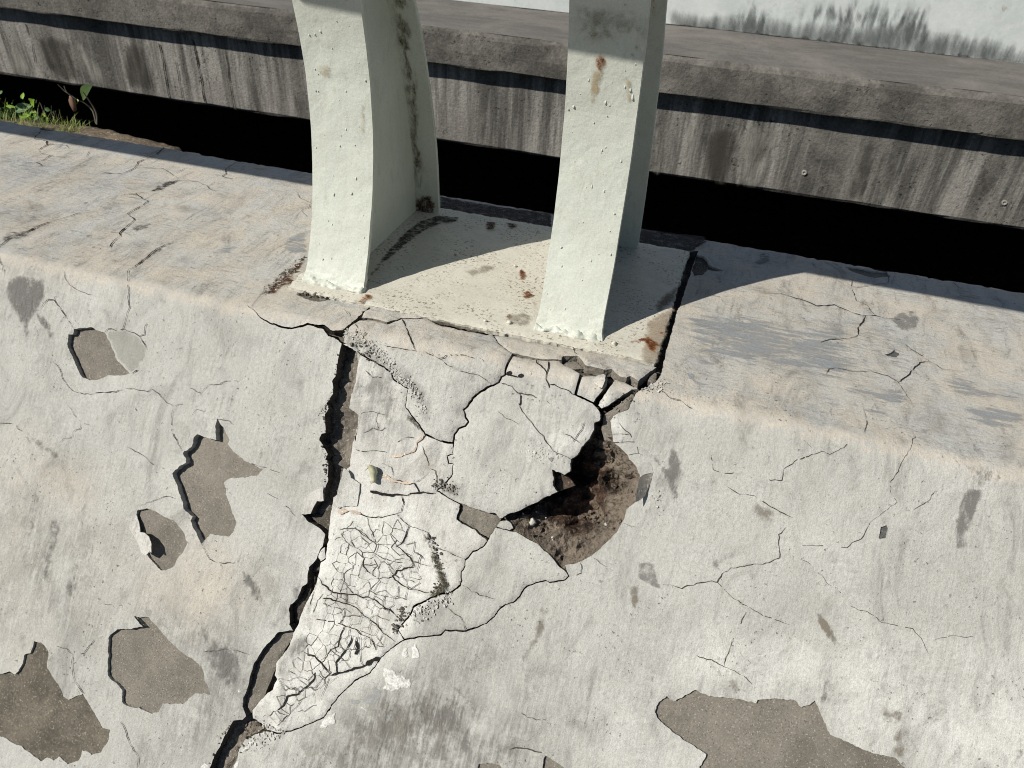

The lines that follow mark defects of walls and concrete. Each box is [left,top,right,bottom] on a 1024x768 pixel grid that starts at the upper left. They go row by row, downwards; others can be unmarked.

corrosion [591,56,605,94]
crack [41,243,170,347]
corrosion [631,288,677,362]
crack [781,273,893,342]
crack [827,346,965,401]
peeling [137,419,263,571]
crack [217,310,584,768]
spalling [208,305,677,768]
crack [663,414,972,682]
peeling [0,641,110,764]
peeling [108,617,211,714]
peeling [655,690,905,768]